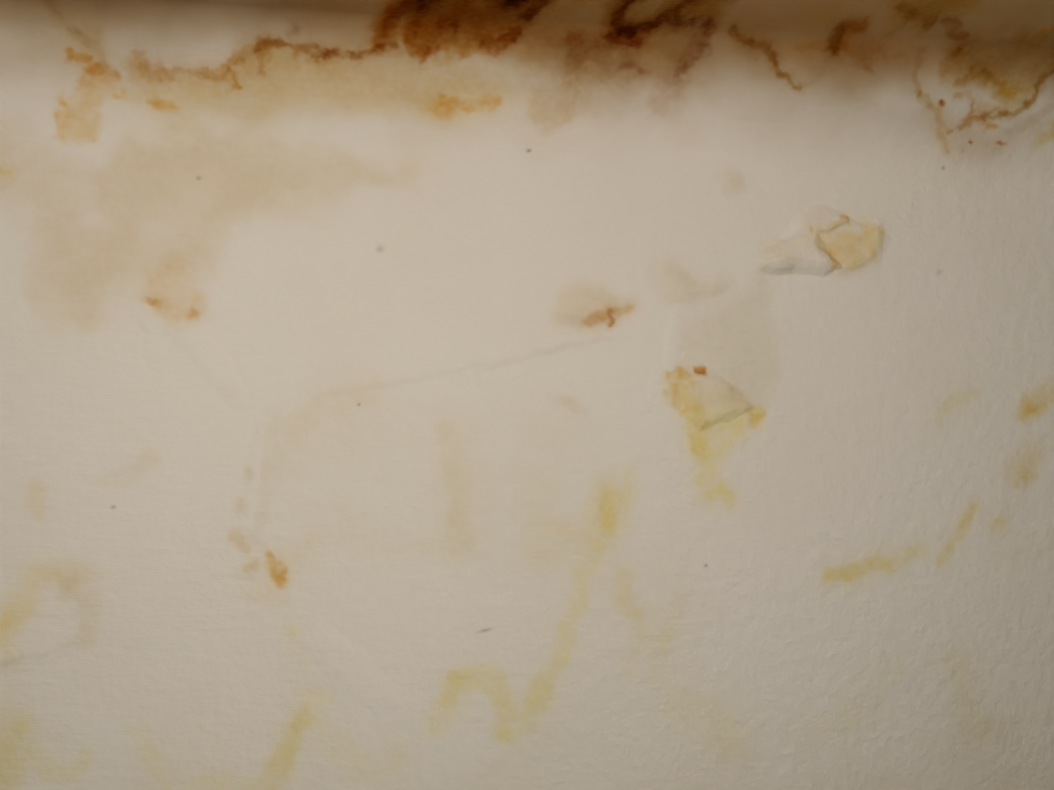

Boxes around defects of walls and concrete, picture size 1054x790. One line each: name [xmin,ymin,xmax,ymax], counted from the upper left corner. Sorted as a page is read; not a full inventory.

peeling [754,203,892,282]
peeling [681,375,754,432]